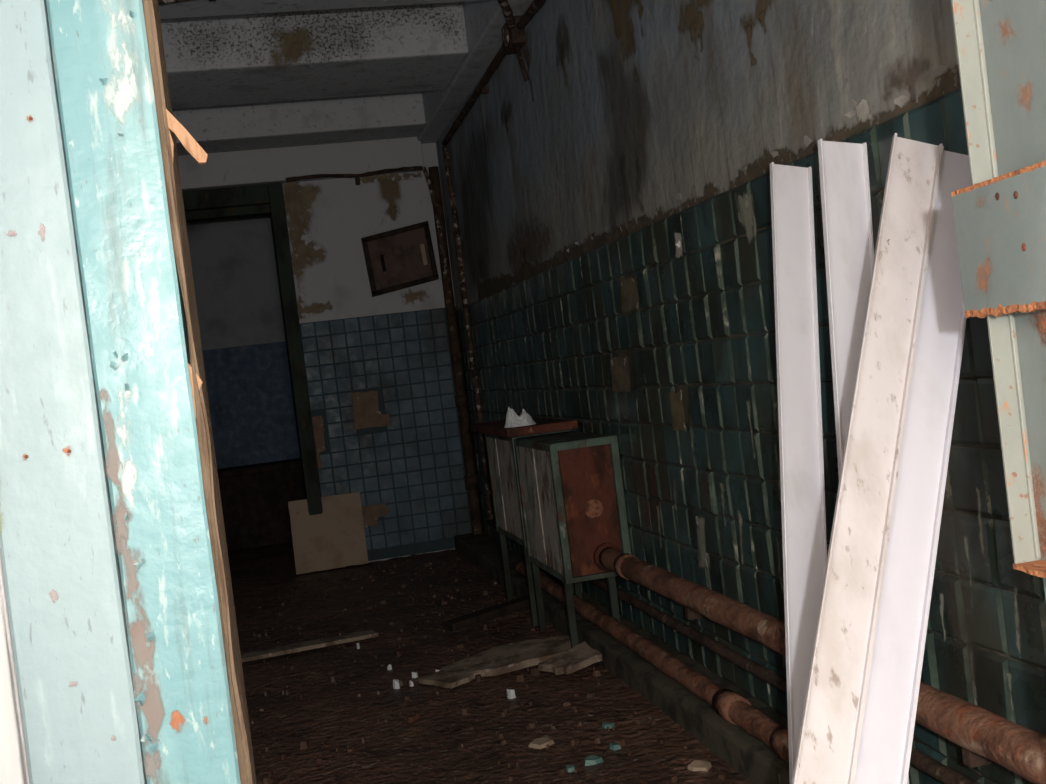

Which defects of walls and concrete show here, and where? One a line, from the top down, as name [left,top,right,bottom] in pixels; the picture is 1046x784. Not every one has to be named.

peeling [284,181,332,319]
peeling [110,351,132,370]
peeling [351,391,391,430]
peeling [100,383,164,784]